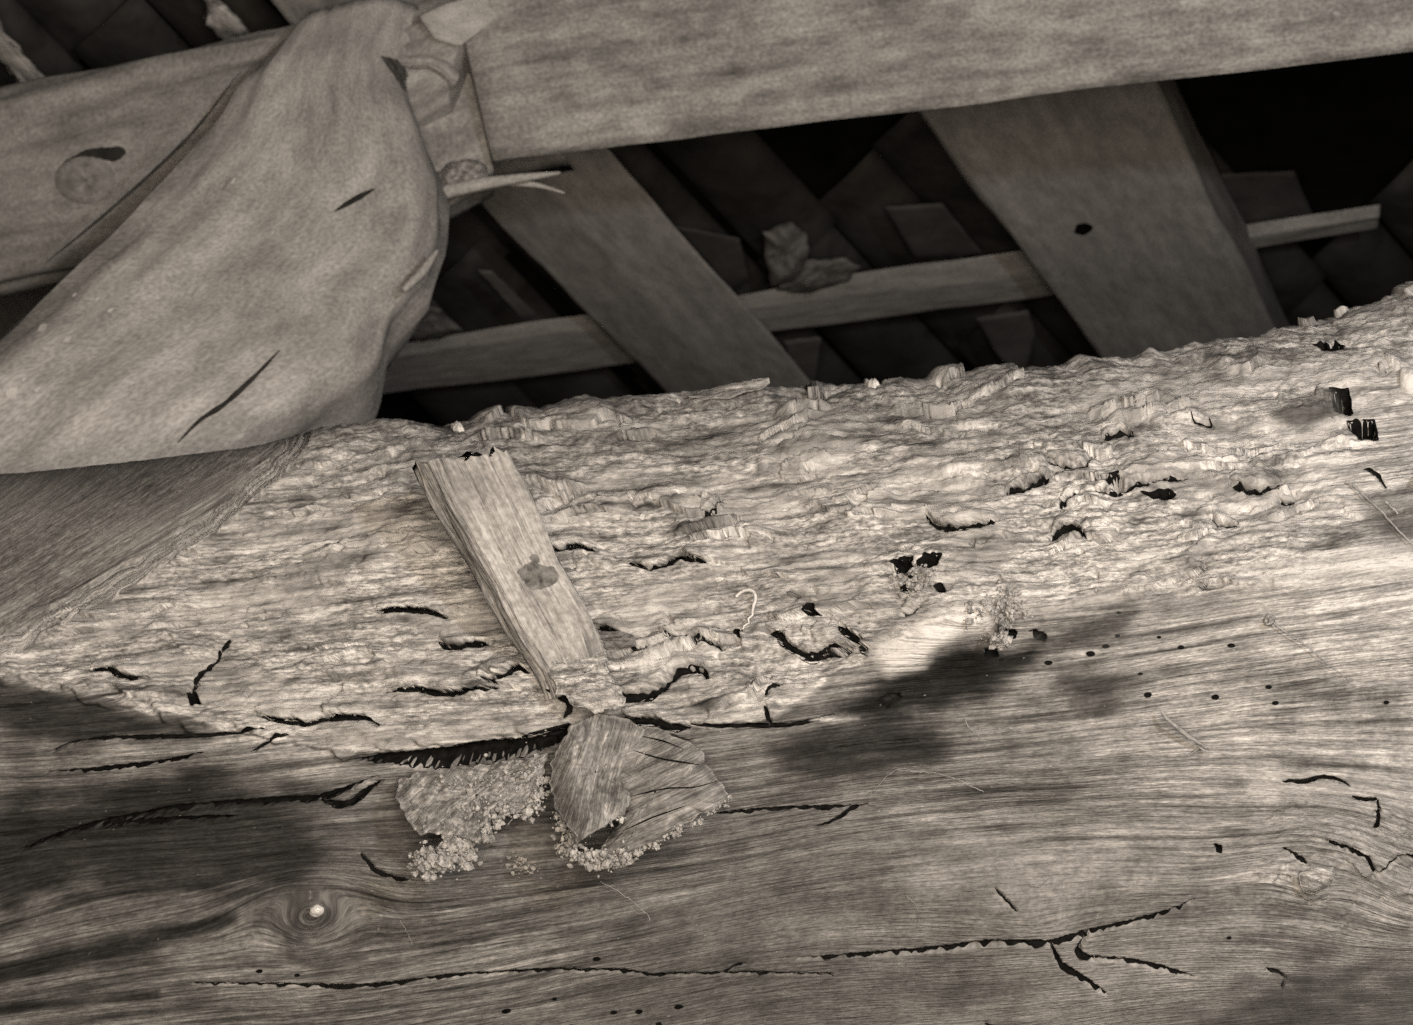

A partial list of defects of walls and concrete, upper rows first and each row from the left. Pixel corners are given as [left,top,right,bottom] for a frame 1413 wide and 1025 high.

spalling [349,723,570,770]
crack [25,775,381,848]
crack [1282,775,1413,872]
crack [194,888,1191,993]